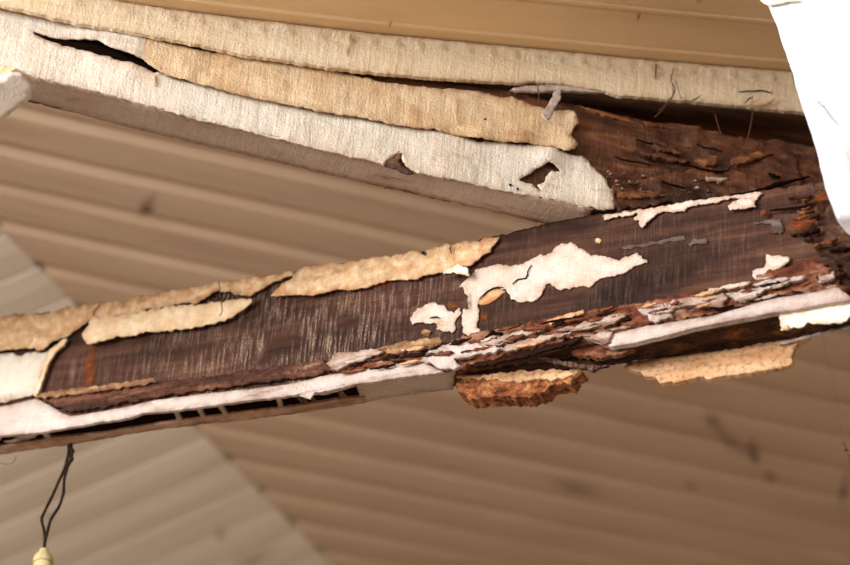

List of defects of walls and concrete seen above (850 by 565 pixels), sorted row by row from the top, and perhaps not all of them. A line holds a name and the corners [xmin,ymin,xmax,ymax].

peeling [0,8,763,228]
crack [615,139,735,189]
crack [732,173,819,212]
peeling [754,219,784,234]
peeling [637,254,806,324]
peeling [818,271,836,284]
peeling [0,236,708,403]
peeling [779,304,850,331]